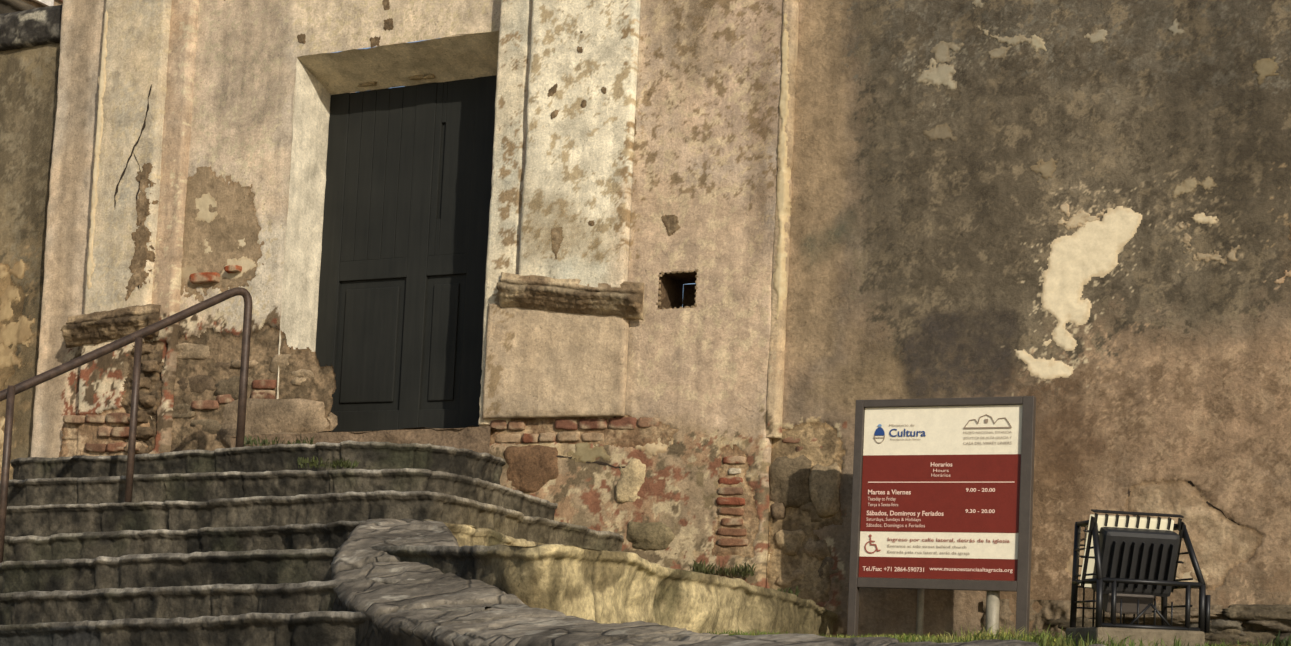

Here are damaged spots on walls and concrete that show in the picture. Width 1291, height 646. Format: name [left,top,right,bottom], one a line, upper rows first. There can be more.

crack [114,85,159,301]
flaking render [59,324,338,457]
flaking render [180,166,264,301]
leakage [904,312,1017,398]
peeling [1014,203,1142,381]
flaking render [489,415,678,503]
flaking render [626,521,675,551]
flaking render [711,444,760,558]